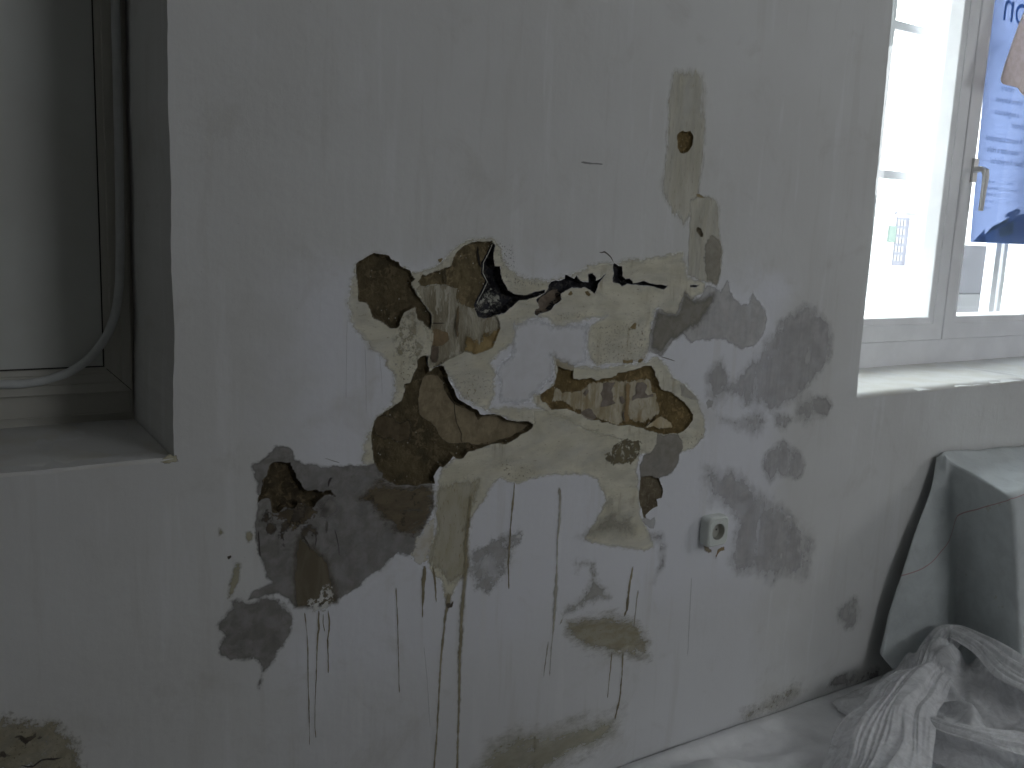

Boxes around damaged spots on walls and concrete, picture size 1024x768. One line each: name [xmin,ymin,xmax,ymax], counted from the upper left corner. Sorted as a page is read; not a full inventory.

flaking render [677,130,694,154]
crack [474,242,698,318]
flaking render [356,241,533,486]
flaking render [540,359,697,435]
flaking render [257,462,335,513]
peeling [307,584,334,612]
water stain [219,446,434,685]
peeling [410,519,436,564]
flaking render [639,476,663,519]
water stain [708,473,811,572]